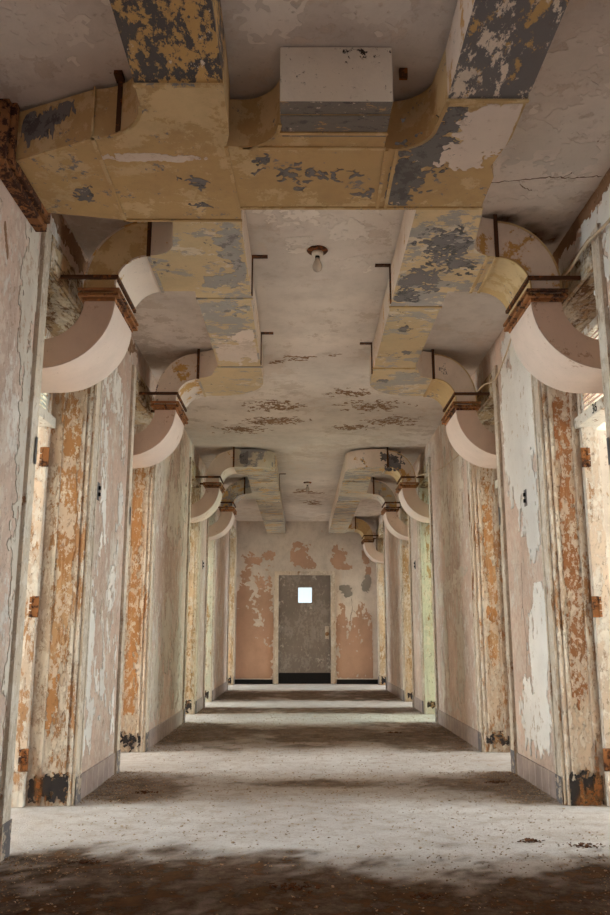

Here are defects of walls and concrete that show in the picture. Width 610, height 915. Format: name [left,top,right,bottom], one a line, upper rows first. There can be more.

peeling [21,100,76,148]
peeling [251,104,523,254]
crack [491,172,601,191]
peeling [394,225,479,303]
peeling [211,400,312,434]
peeling [500,332,541,564]
peeling [45,391,83,742]
peeling [82,368,146,759]
peeling [235,550,276,679]
peeling [519,581,552,759]
corrosion [577,740,602,806]